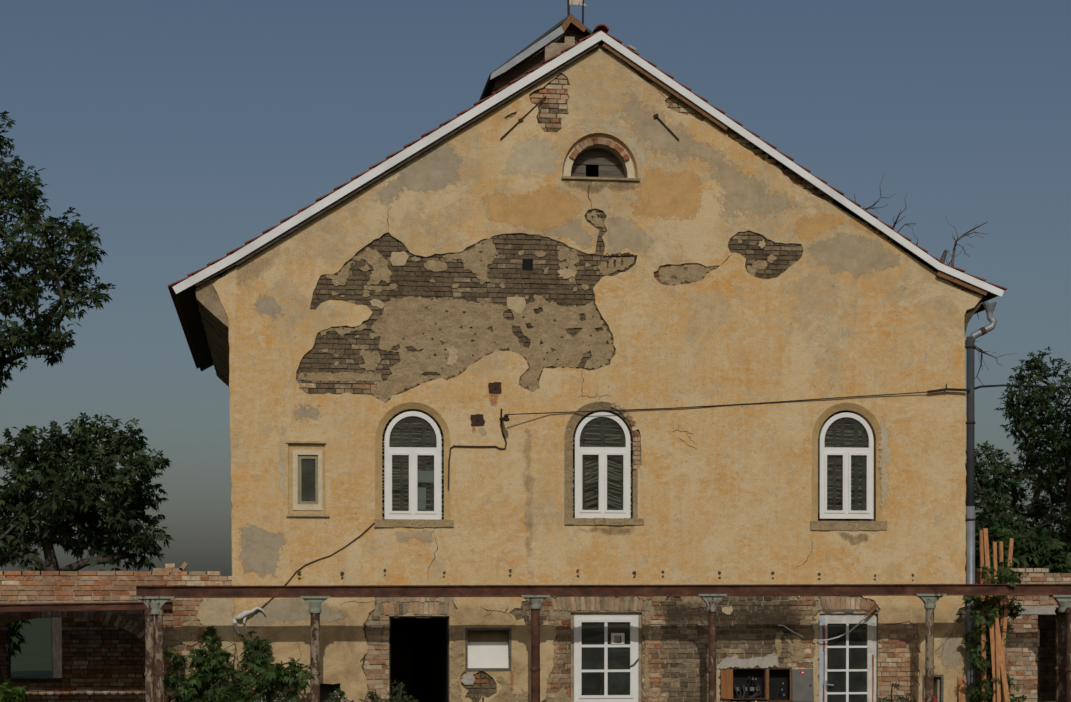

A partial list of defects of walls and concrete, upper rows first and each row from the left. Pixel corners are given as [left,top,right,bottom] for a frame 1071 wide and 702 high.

spalling [529,70,569,132]
peeling [378,143,463,205]
peeling [620,93,893,285]
spalling [294,209,637,421]
spalling [360,597,457,702]
spalling [449,595,919,702]